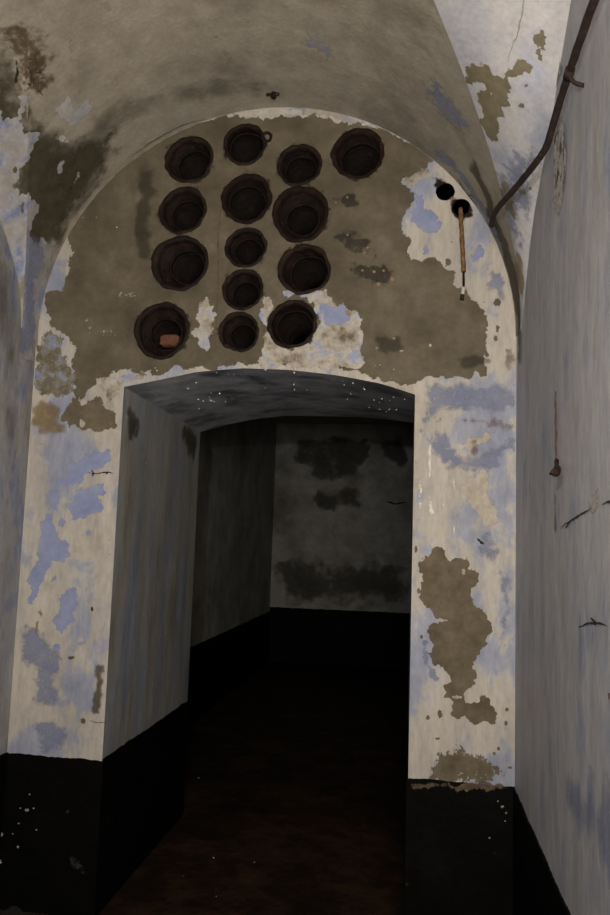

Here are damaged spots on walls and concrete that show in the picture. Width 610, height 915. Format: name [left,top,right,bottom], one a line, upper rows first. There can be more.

peeling [465,30,546,142]
crack [508,0,524,61]
leakage [0,62,112,244]
peeling [0,94,514,432]
peeling [23,587,78,704]
peeling [27,449,111,604]
leakage [295,438,369,479]
leakage [315,489,359,509]
leakage [279,563,402,601]
peeling [414,546,509,726]
peeling [433,432,514,557]
peeling [412,745,512,792]